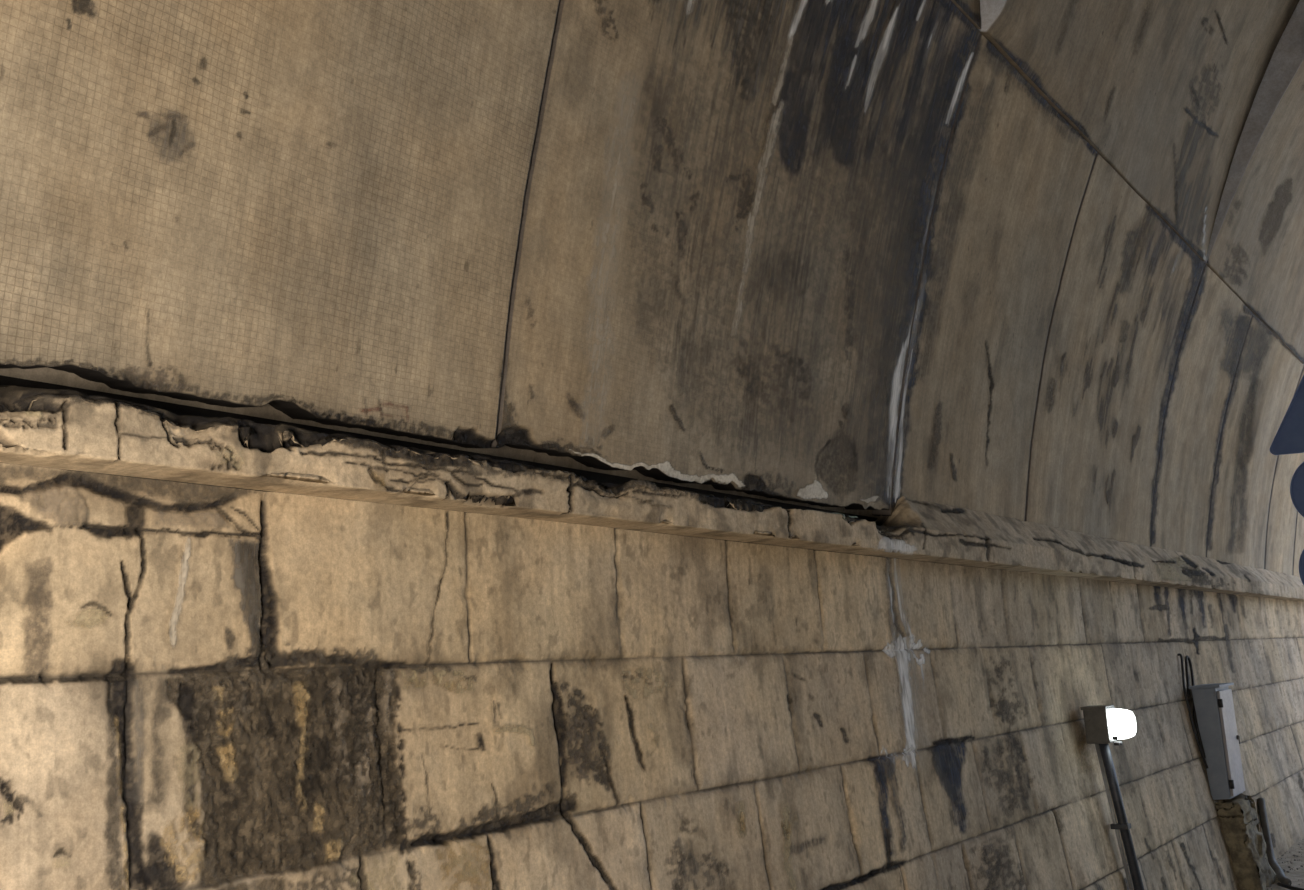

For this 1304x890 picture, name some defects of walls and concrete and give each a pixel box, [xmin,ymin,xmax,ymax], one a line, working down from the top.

damp [673,0,1100,508]
damp [1082,64,1220,544]
damp [228,540,261,658]
crack [300,451,514,665]
spalling [445,452,791,538]
peeling [797,405,878,503]
damp [880,538,915,554]
crack [986,350,994,464]
crack [878,501,1132,767]
crack [599,695,645,805]
damp [931,736,975,833]
crack [561,812,616,890]